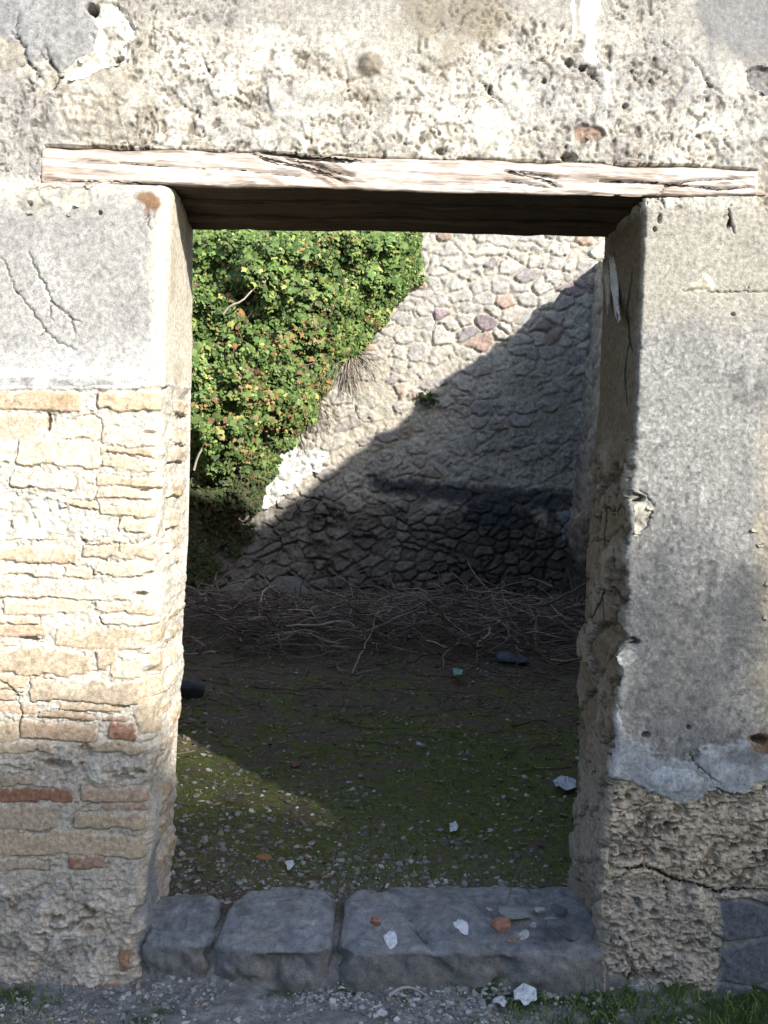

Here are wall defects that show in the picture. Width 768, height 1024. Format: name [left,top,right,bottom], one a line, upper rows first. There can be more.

spalling [58,0,139,82]
crack [3,258,80,349]
crack [610,864,766,902]